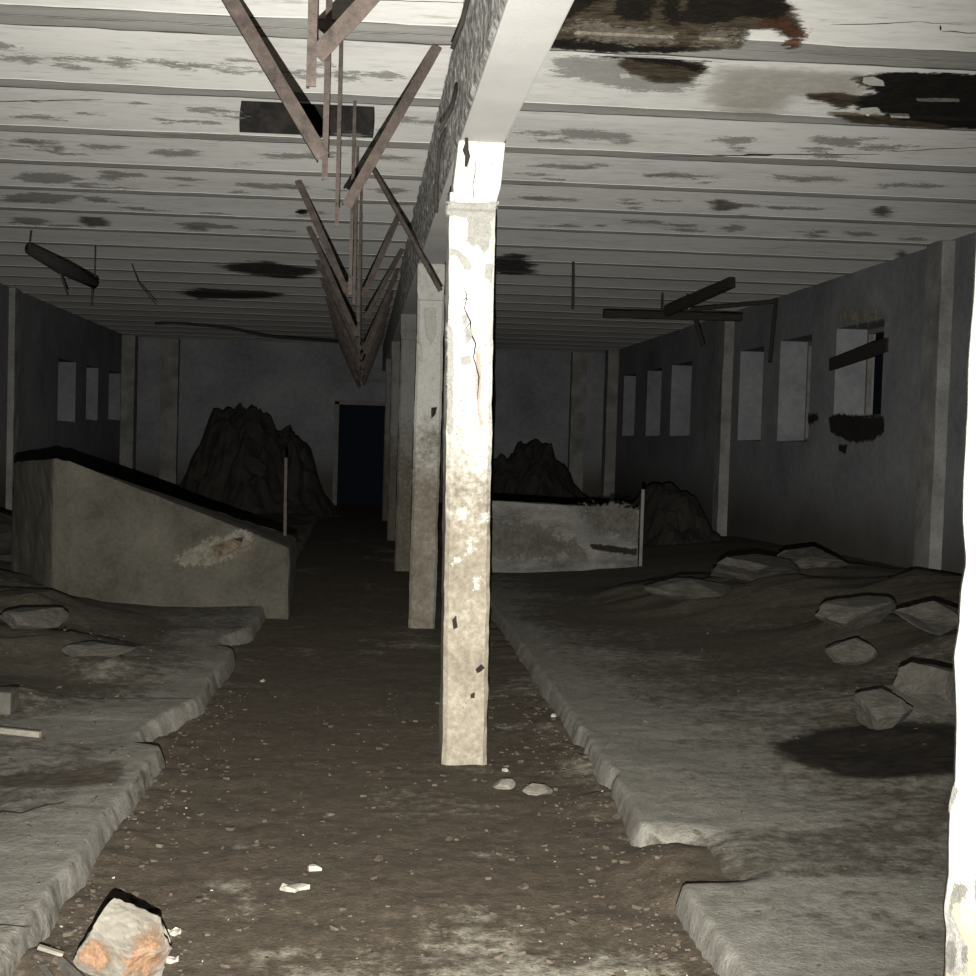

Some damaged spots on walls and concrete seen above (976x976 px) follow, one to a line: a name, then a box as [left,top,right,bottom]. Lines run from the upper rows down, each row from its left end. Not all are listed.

water stain [551,0,808,54]
water stain [213,260,319,279]
crack [462,287,480,400]
spalling [829,413,884,454]
spalling [175,529,254,568]